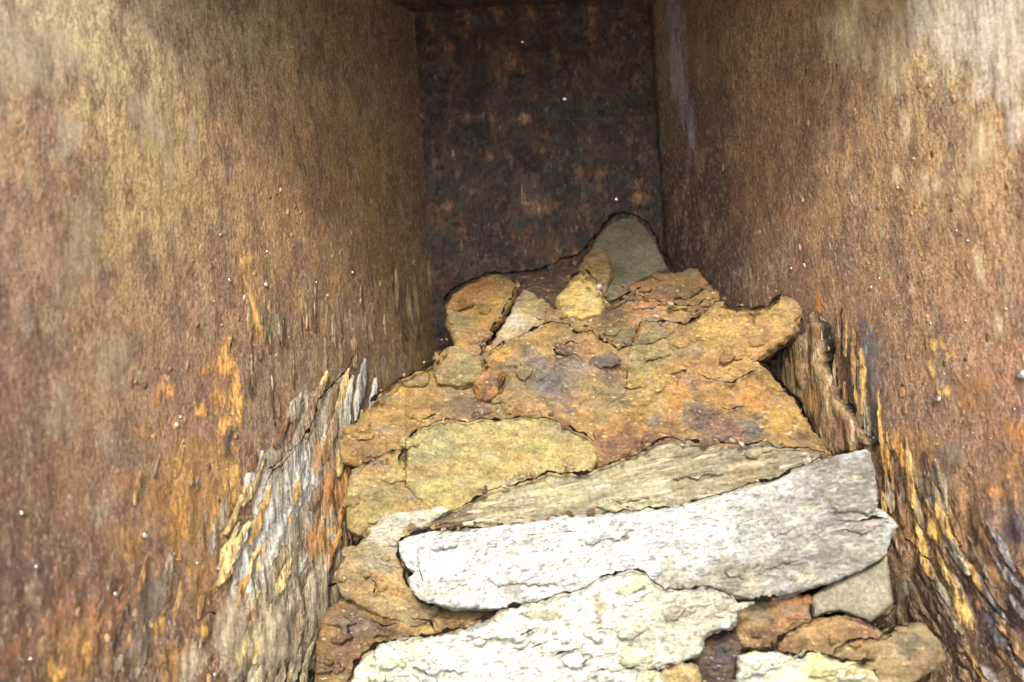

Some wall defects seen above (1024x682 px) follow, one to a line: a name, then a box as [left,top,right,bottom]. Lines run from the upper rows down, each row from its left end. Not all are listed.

rust [922,337,993,418]
rust [43,247,433,682]
peeling [341,416,375,440]
rust [884,421,972,478]
rust [984,417,1024,546]
peeling [341,517,380,557]
rust [899,493,969,556]
rust [953,559,1024,640]
peeling [328,616,356,644]
peeling [756,652,803,665]
peeling [811,636,877,681]